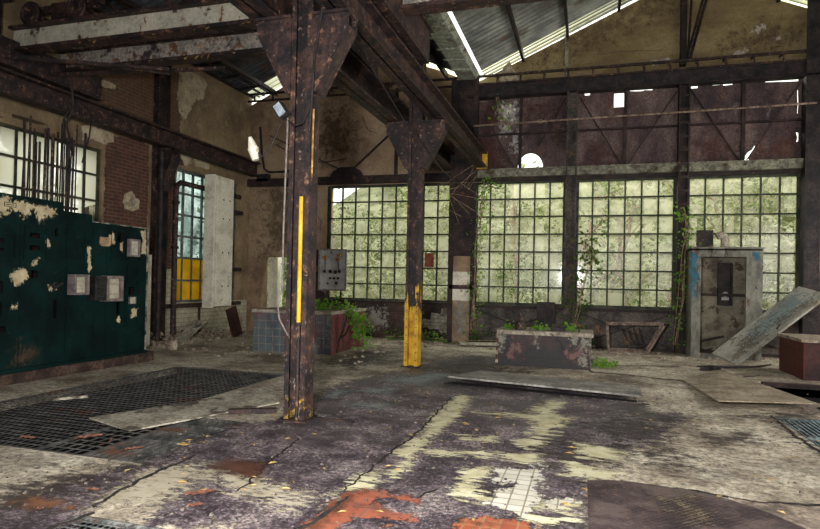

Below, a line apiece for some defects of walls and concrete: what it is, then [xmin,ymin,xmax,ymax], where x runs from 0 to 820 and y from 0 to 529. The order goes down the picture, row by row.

spalling [91,73,154,122]
peeling [170,72,208,132]
peeling [0,195,58,224]
spalling [81,125,149,255]
crack [679,488,820,507]